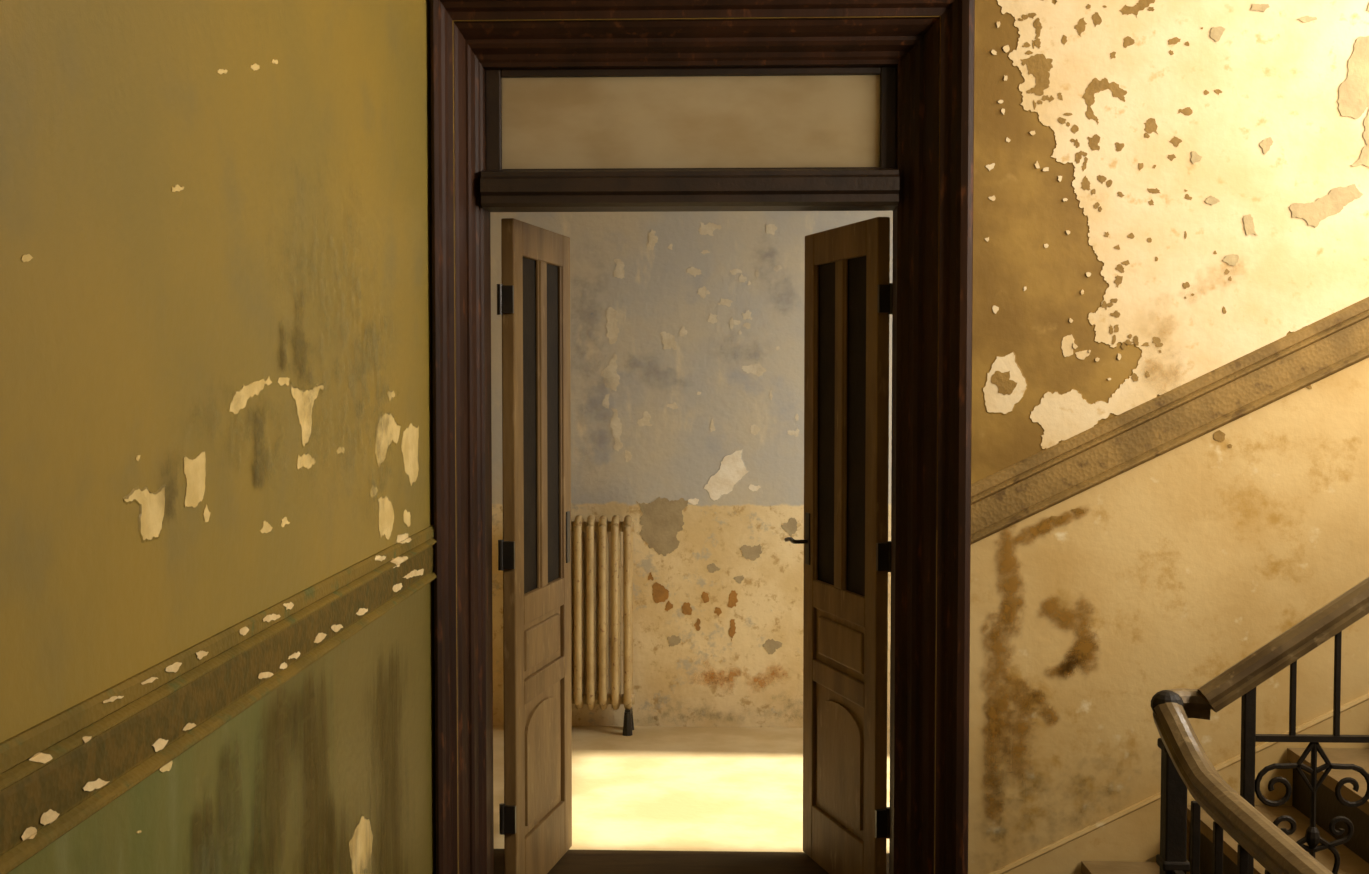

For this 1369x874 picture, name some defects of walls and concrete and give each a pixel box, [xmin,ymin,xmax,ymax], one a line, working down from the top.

peeling [982,0,1369,450]
peeling [229,376,325,470]
peeling [123,484,166,543]
peeling [183,451,211,522]
peeling [688,449,761,505]
spalling [240,602,294,636]
spalling [648,544,762,641]
spalling [258,652,300,679]
spalling [83,778,110,791]
spalling [152,738,173,773]
spalling [21,809,59,841]
peeling [348,814,373,874]